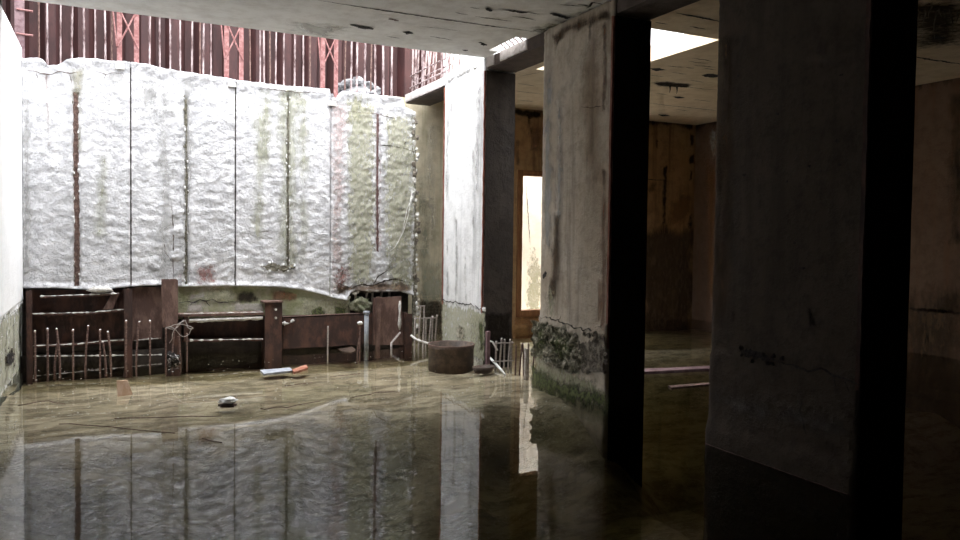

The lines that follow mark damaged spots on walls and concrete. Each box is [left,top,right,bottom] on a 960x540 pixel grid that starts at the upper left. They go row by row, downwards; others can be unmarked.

damp [655,82,689,94]
damp [258,108,268,161]
damp [280,90,308,265]
rust [196,264,221,285]
crack [539,316,605,336]
damp [531,364,608,410]